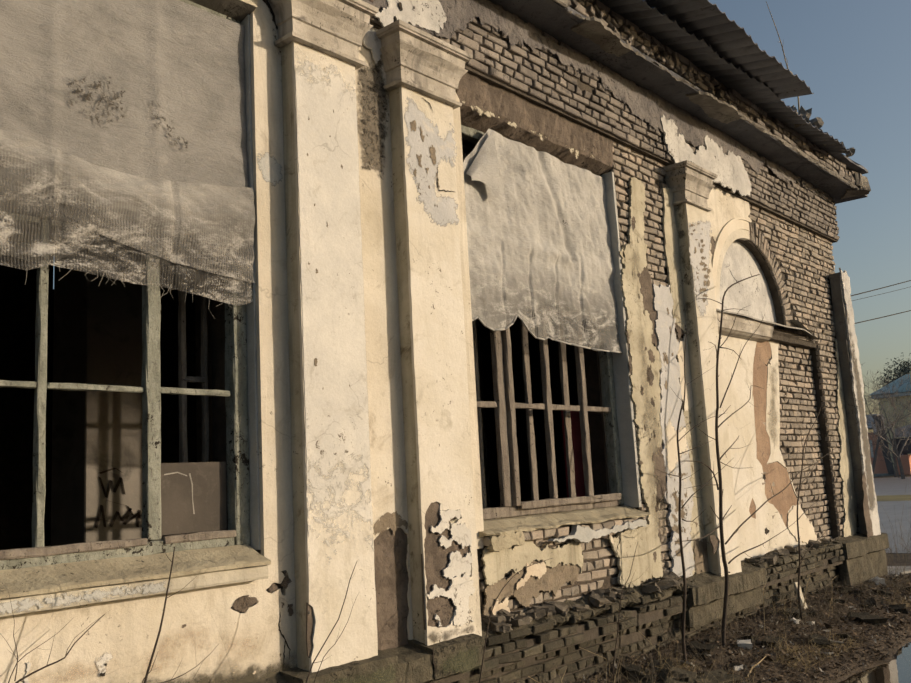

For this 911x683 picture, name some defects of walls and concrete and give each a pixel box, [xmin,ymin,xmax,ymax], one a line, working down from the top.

peeling [362,0,447,64]
peeling [257,152,282,186]
peeling [405,98,459,227]
peeling [462,101,517,128]
peeling [660,114,751,196]
peeling [295,49,409,651]
peeling [607,177,719,588]
flaking render [752,341,817,544]
flaking render [232,595,259,613]
flaking render [269,571,294,616]
peeling [421,502,583,630]
damp [168,656,295,683]